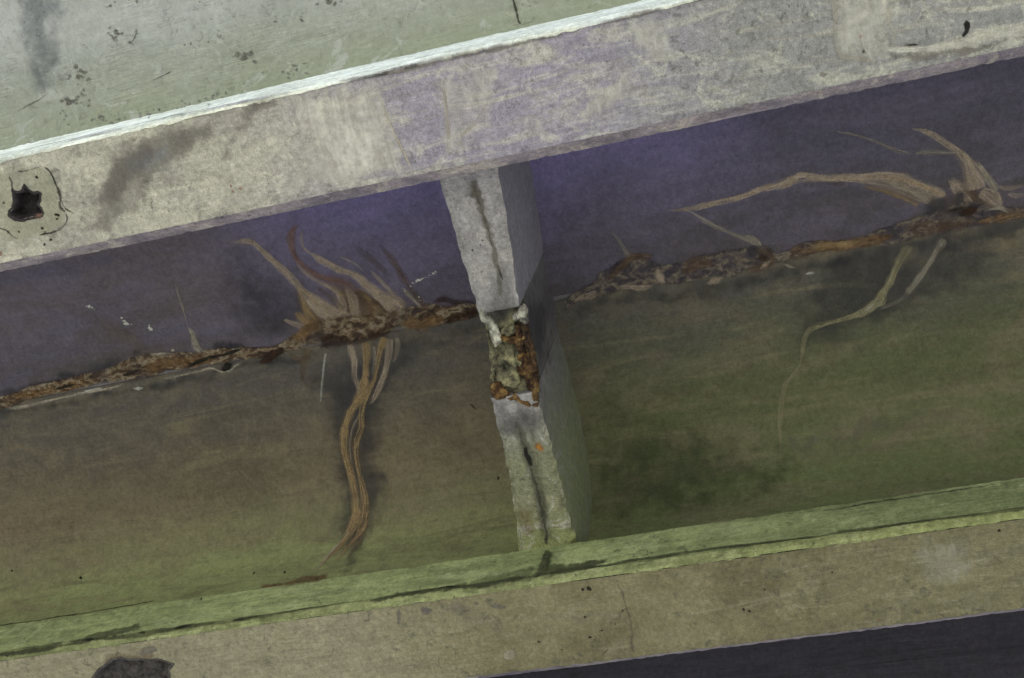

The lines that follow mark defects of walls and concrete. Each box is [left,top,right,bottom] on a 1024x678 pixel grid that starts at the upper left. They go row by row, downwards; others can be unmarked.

spalling [3,176,60,246]
rust [251,242,403,326]